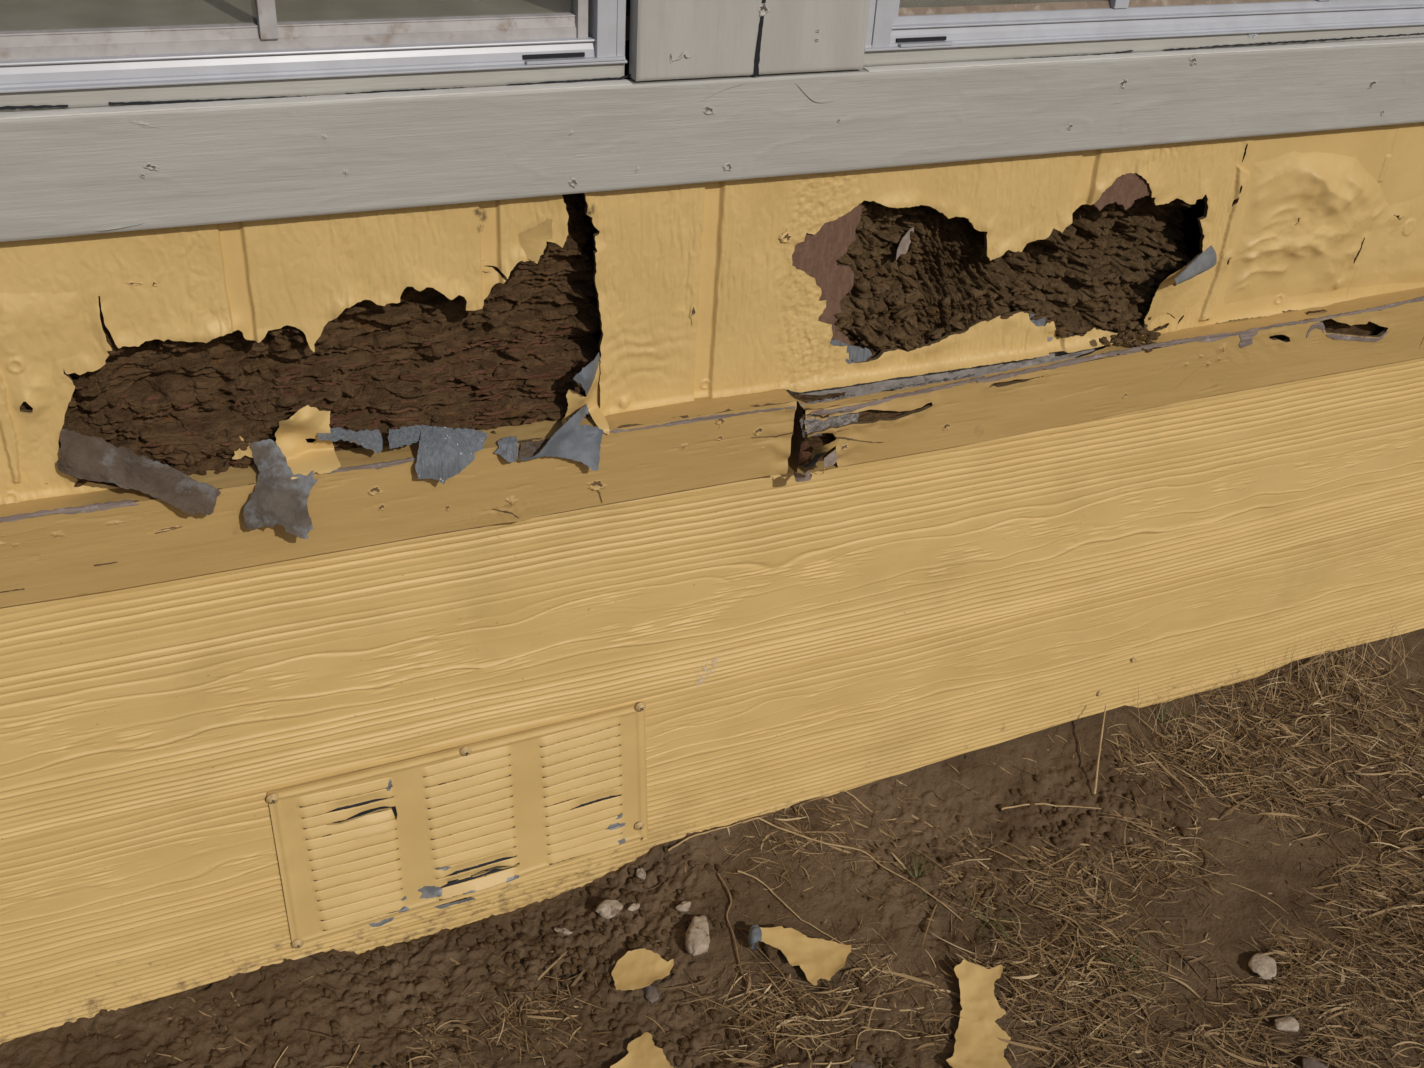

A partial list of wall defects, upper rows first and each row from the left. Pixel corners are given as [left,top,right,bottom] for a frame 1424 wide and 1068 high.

spalling [624,40,632,79]
peeling [1092,173,1150,211]
spalling [588,216,598,270]
spalling [1169,197,1205,275]
peeling [779,203,863,345]
peeling [609,296,1424,441]
peeling [328,457,415,511]